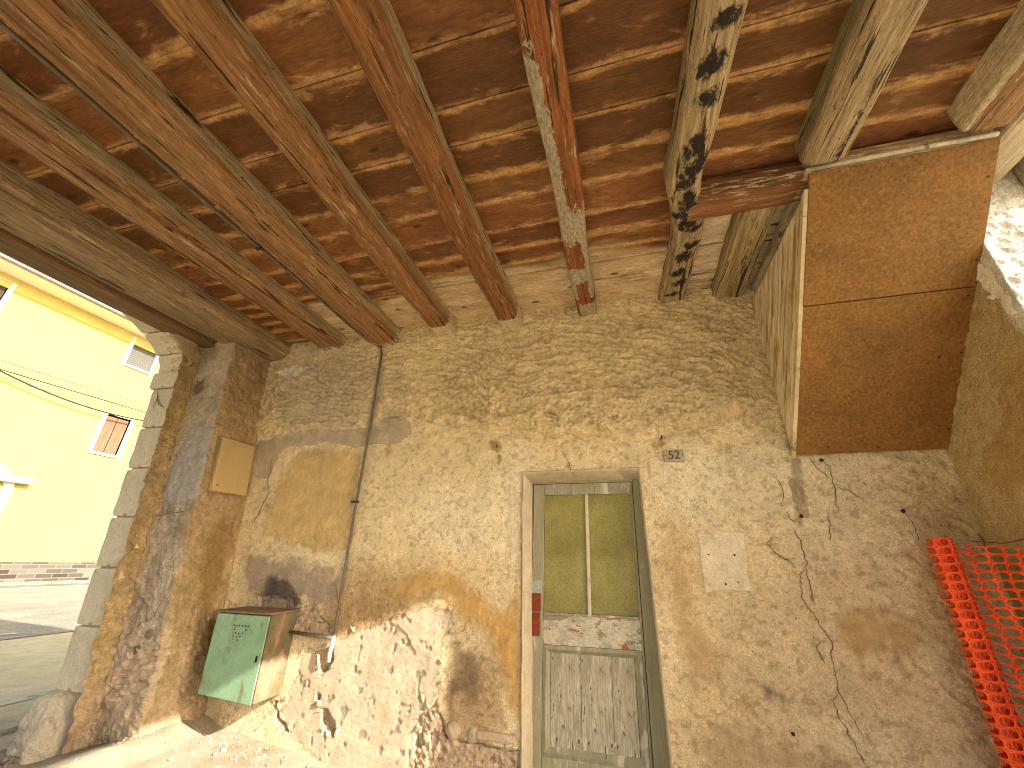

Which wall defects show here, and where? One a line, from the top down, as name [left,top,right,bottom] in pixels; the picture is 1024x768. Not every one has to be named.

crack [810,458,860,540]
water stain [247,556,333,601]
crack [766,474,869,768]
flaking render [256,594,519,768]
water stain [451,654,478,697]